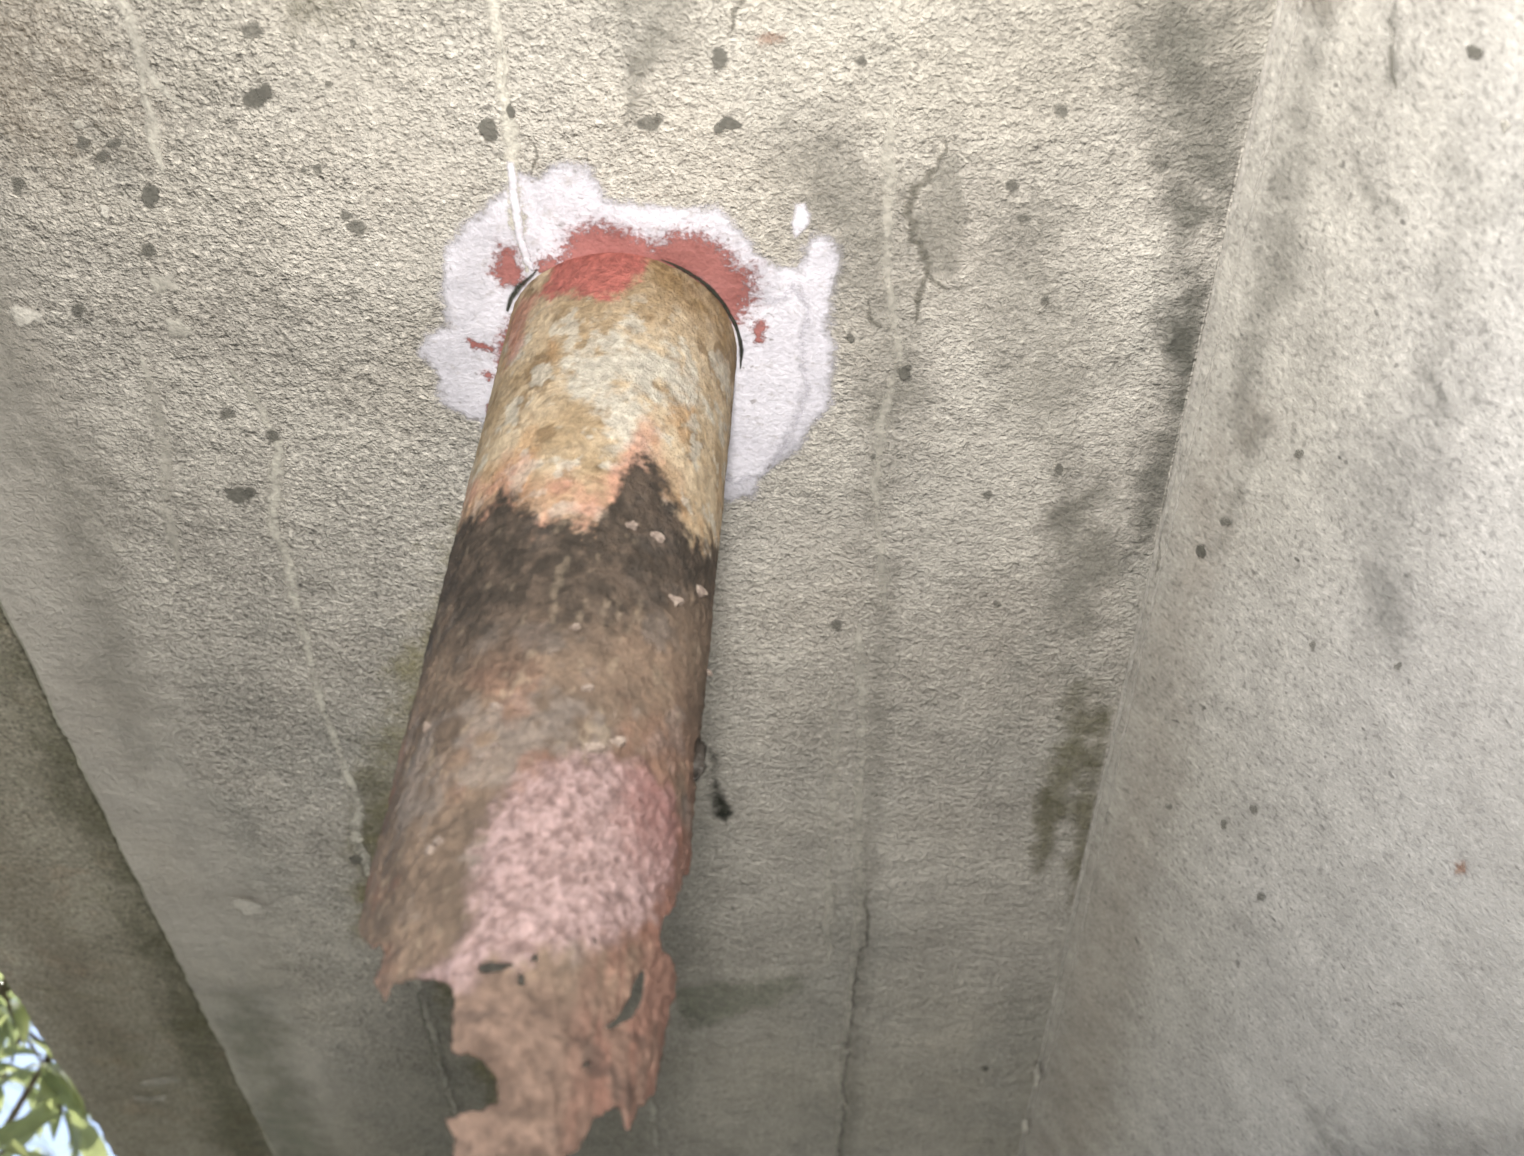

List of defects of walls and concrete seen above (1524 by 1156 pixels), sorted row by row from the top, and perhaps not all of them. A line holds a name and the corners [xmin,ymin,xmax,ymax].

crack [868,147,948,326]
rust [625,520,665,543]
rust [669,585,708,606]
rust [583,736,626,754]
rust [423,836,445,856]